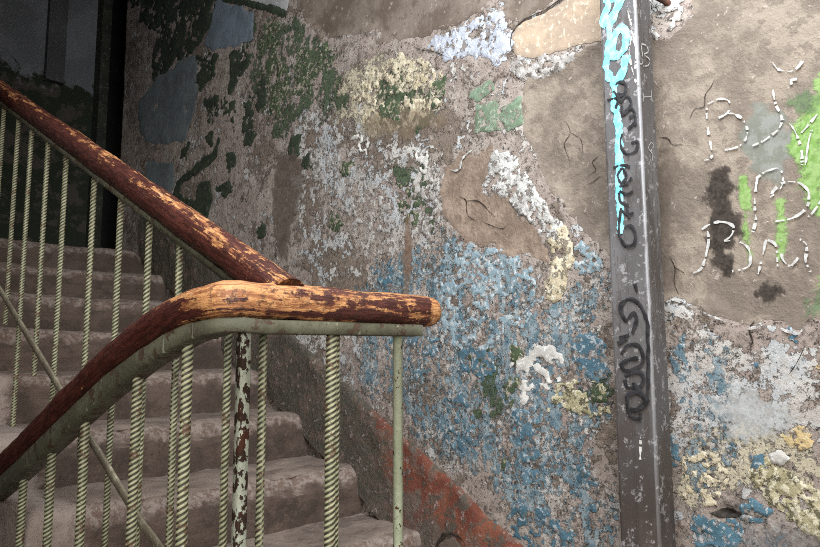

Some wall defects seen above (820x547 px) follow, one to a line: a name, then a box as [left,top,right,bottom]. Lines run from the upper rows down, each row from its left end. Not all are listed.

flaking render [127,0,610,382]
crack [461,197,506,229]
flaking render [650,0,820,344]
peeling [502,331,611,486]
crack [435,532,463,547]
peeling [494,502,577,547]
peeling [671,425,820,547]